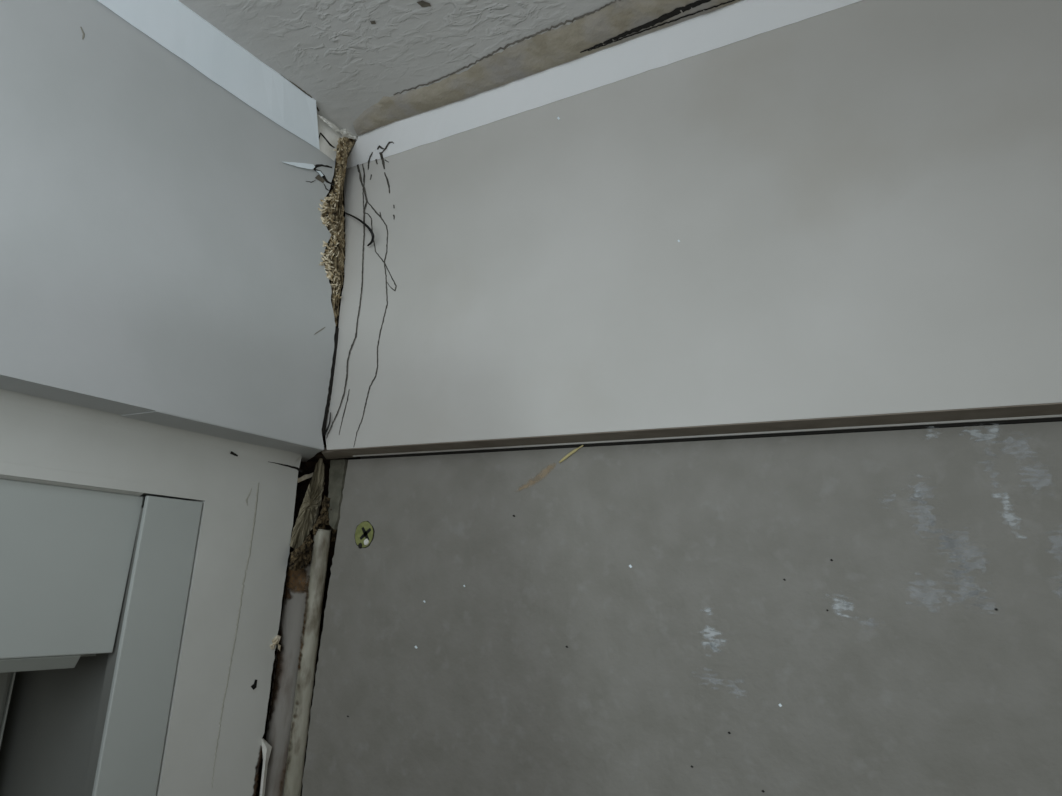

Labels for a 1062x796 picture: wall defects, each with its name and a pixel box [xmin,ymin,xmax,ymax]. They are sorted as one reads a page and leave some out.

crack [393,0,621,95]
crack [580,0,735,53]
crack [283,76,397,445]
spalling [289,495,337,571]